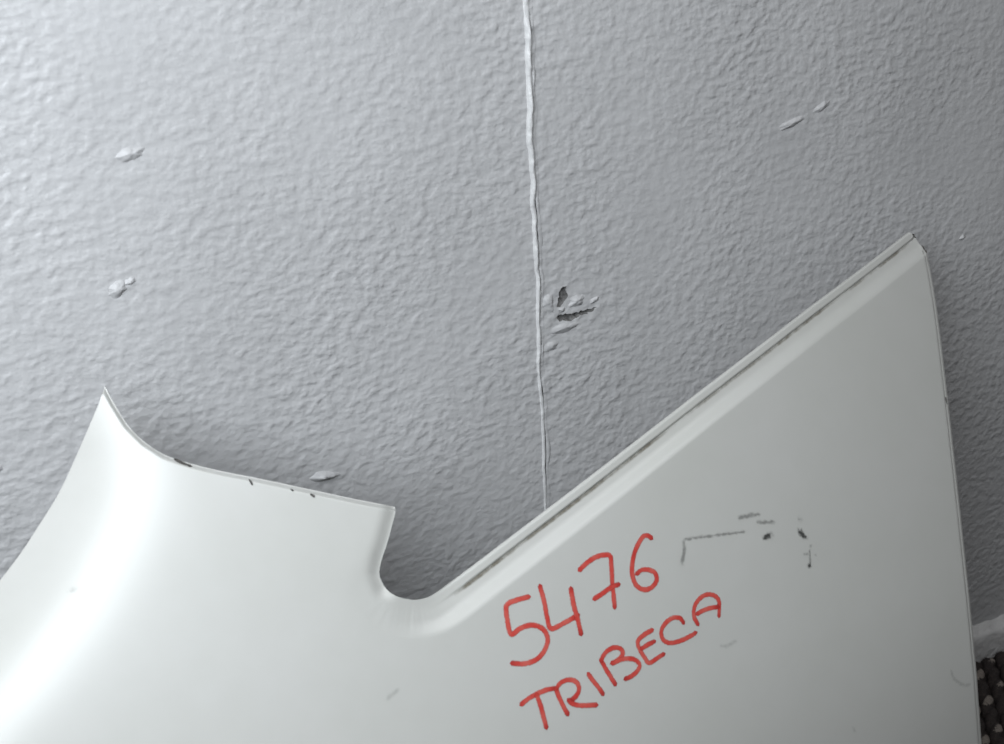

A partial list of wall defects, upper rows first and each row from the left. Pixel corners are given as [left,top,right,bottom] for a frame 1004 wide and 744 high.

crack [523,0,550,511]
spalling [543,286,599,352]